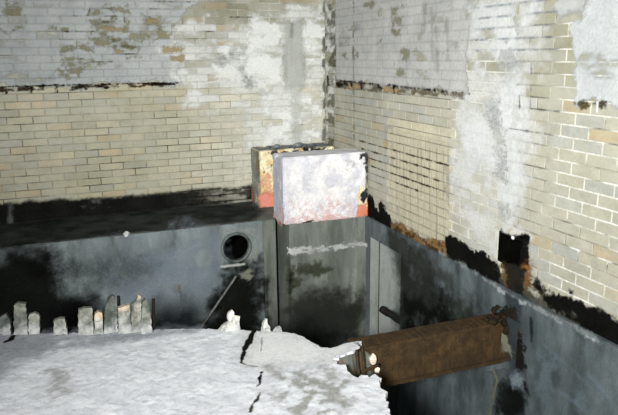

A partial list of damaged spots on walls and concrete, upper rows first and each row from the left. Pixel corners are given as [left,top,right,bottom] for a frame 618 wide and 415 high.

peeling [0,0,204,94]
damp [156,2,326,150]
damp [451,0,542,253]
damp [0,186,269,373]
crack [240,328,263,413]
damp [284,256,366,348]
spalling [341,186,618,415]